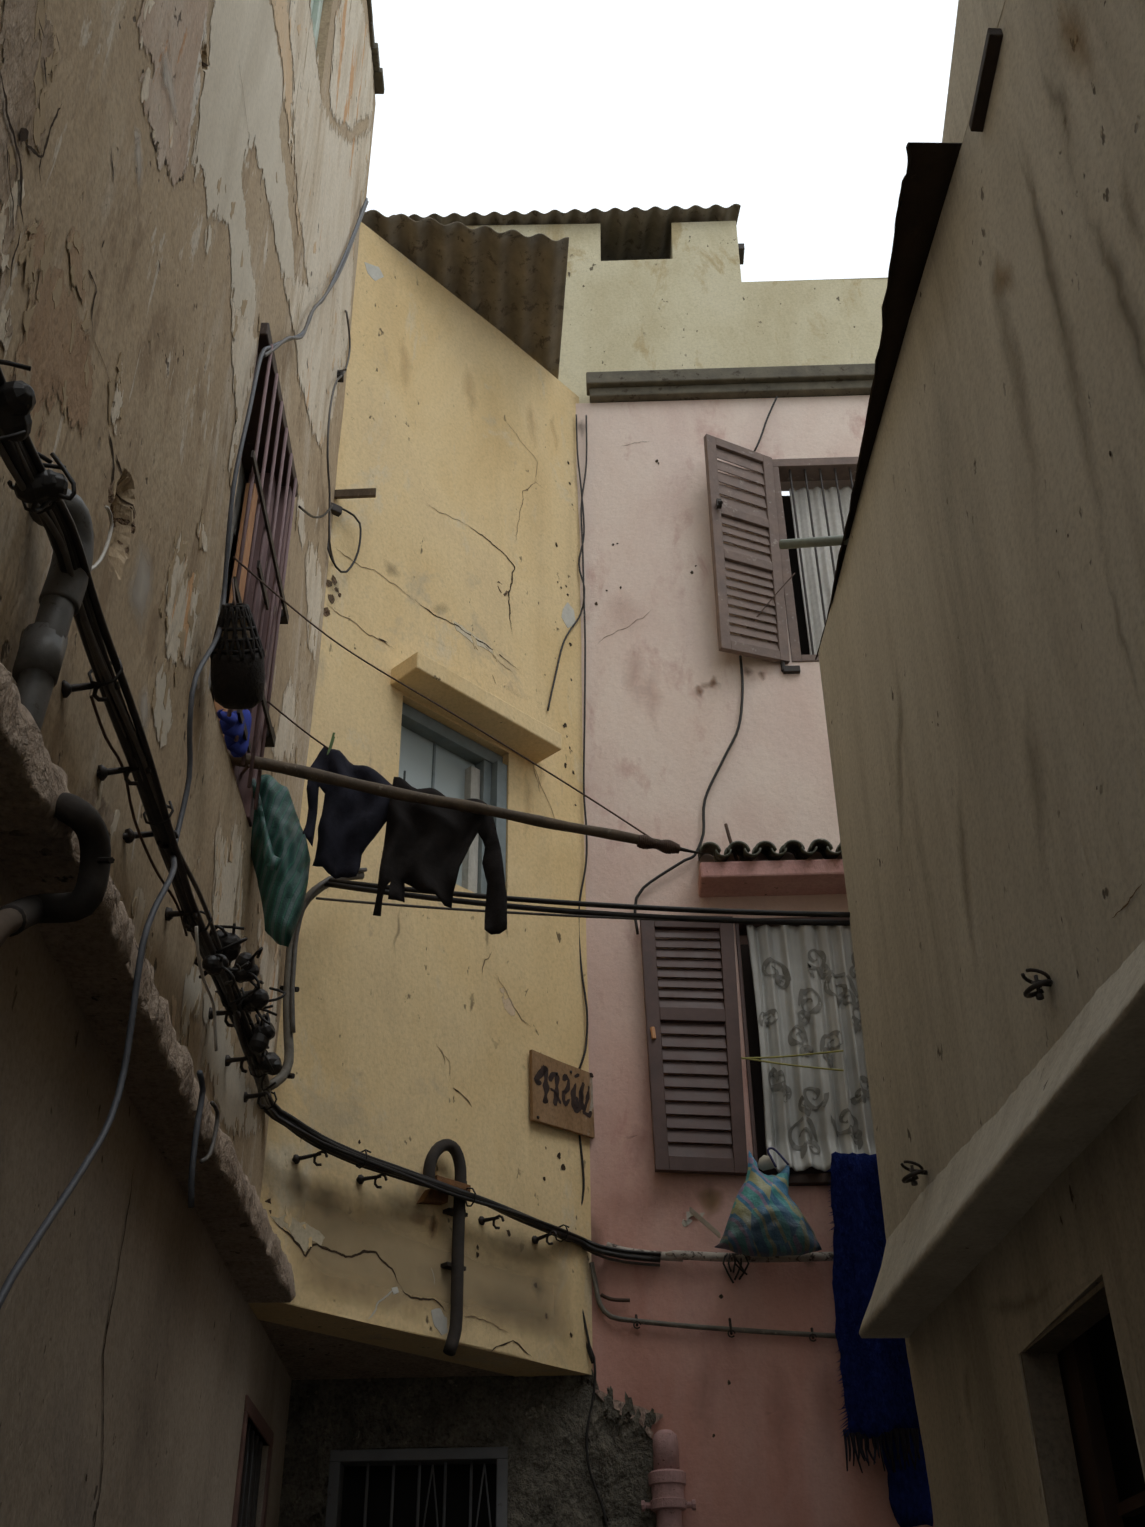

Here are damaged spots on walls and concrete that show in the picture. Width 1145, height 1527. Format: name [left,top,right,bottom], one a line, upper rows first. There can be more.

flaking render [137,0,384,487]
crack [331,423,544,684]
crack [94,1169,134,1527]
crack [275,1222,531,1356]